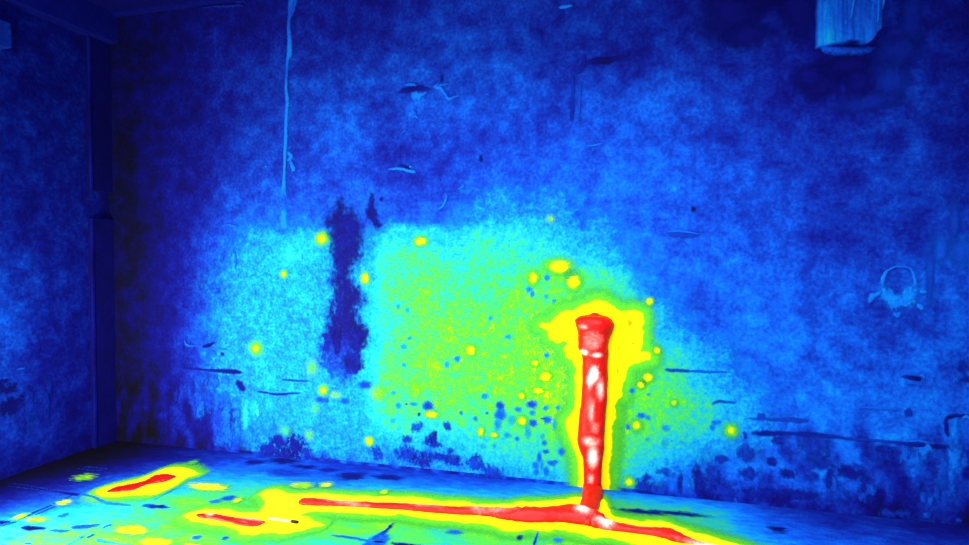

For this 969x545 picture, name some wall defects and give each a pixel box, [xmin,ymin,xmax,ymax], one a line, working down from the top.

leakage [172,185,772,545]
crack [0,467,175,545]
crack [196,513,265,527]
crack [331,523,420,545]